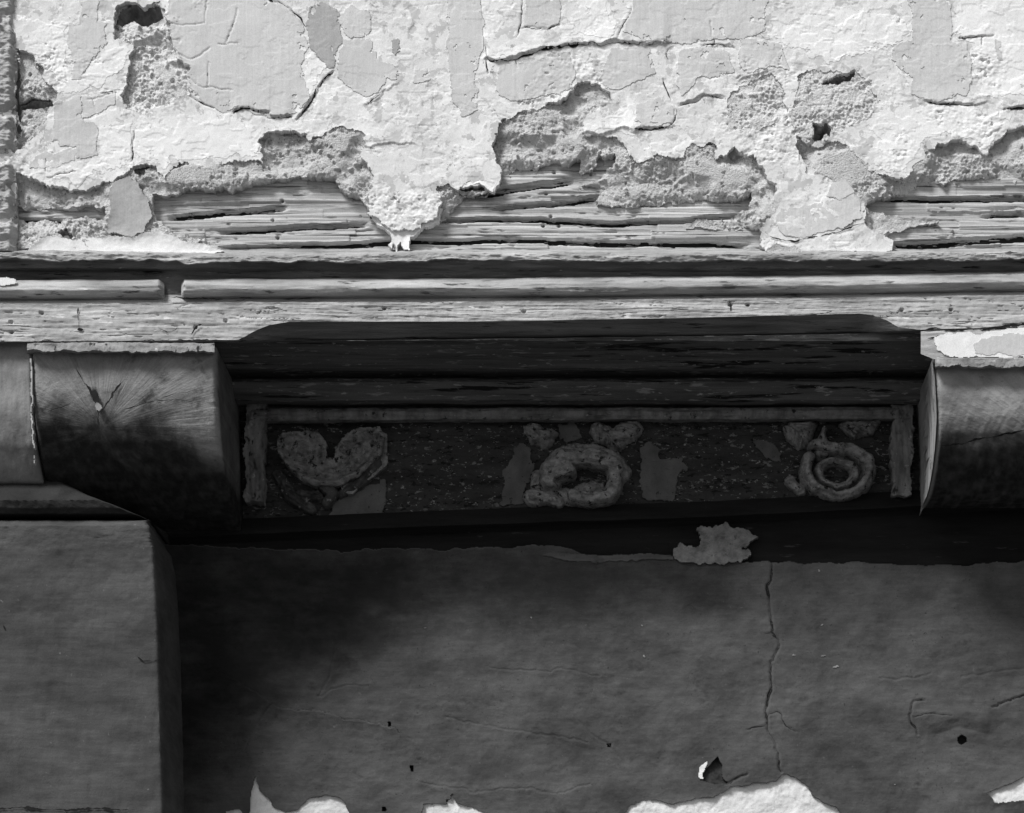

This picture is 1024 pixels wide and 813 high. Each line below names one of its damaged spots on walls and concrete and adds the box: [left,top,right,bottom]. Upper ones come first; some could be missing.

crack [187,57,333,118]
crack [485,0,723,131]
flaking render [12,0,1024,253]
peeling [921,328,1024,507]
flaking render [542,522,758,565]
crack [749,559,792,772]
flaking render [226,777,349,813]
flaking render [422,794,483,813]
flaking render [626,757,840,813]
flaking render [988,777,1024,803]